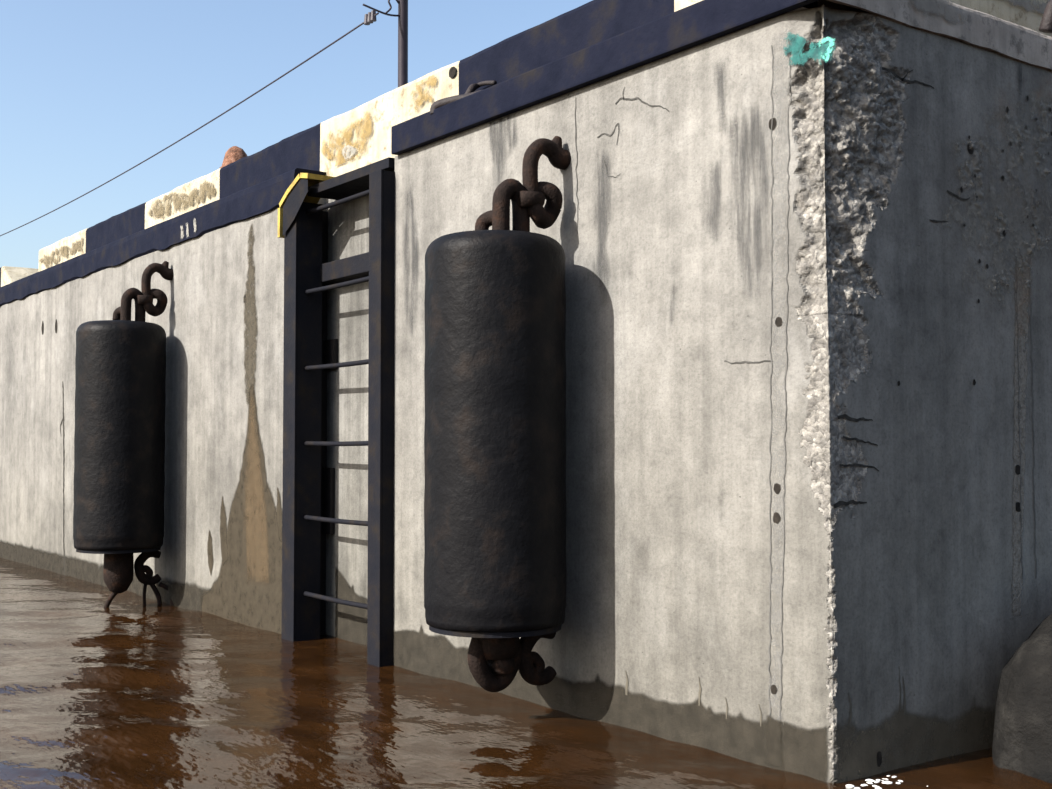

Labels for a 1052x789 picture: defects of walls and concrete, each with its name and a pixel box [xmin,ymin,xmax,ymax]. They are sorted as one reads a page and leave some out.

crack [575,87,669,234]
leakage [735,114,766,195]
leakage [748,209,760,271]
leakage [127,225,282,634]
spalling [784,12,910,777]
leakage [0,541,107,587]
leakage [393,626,482,688]
leakage [499,668,995,783]